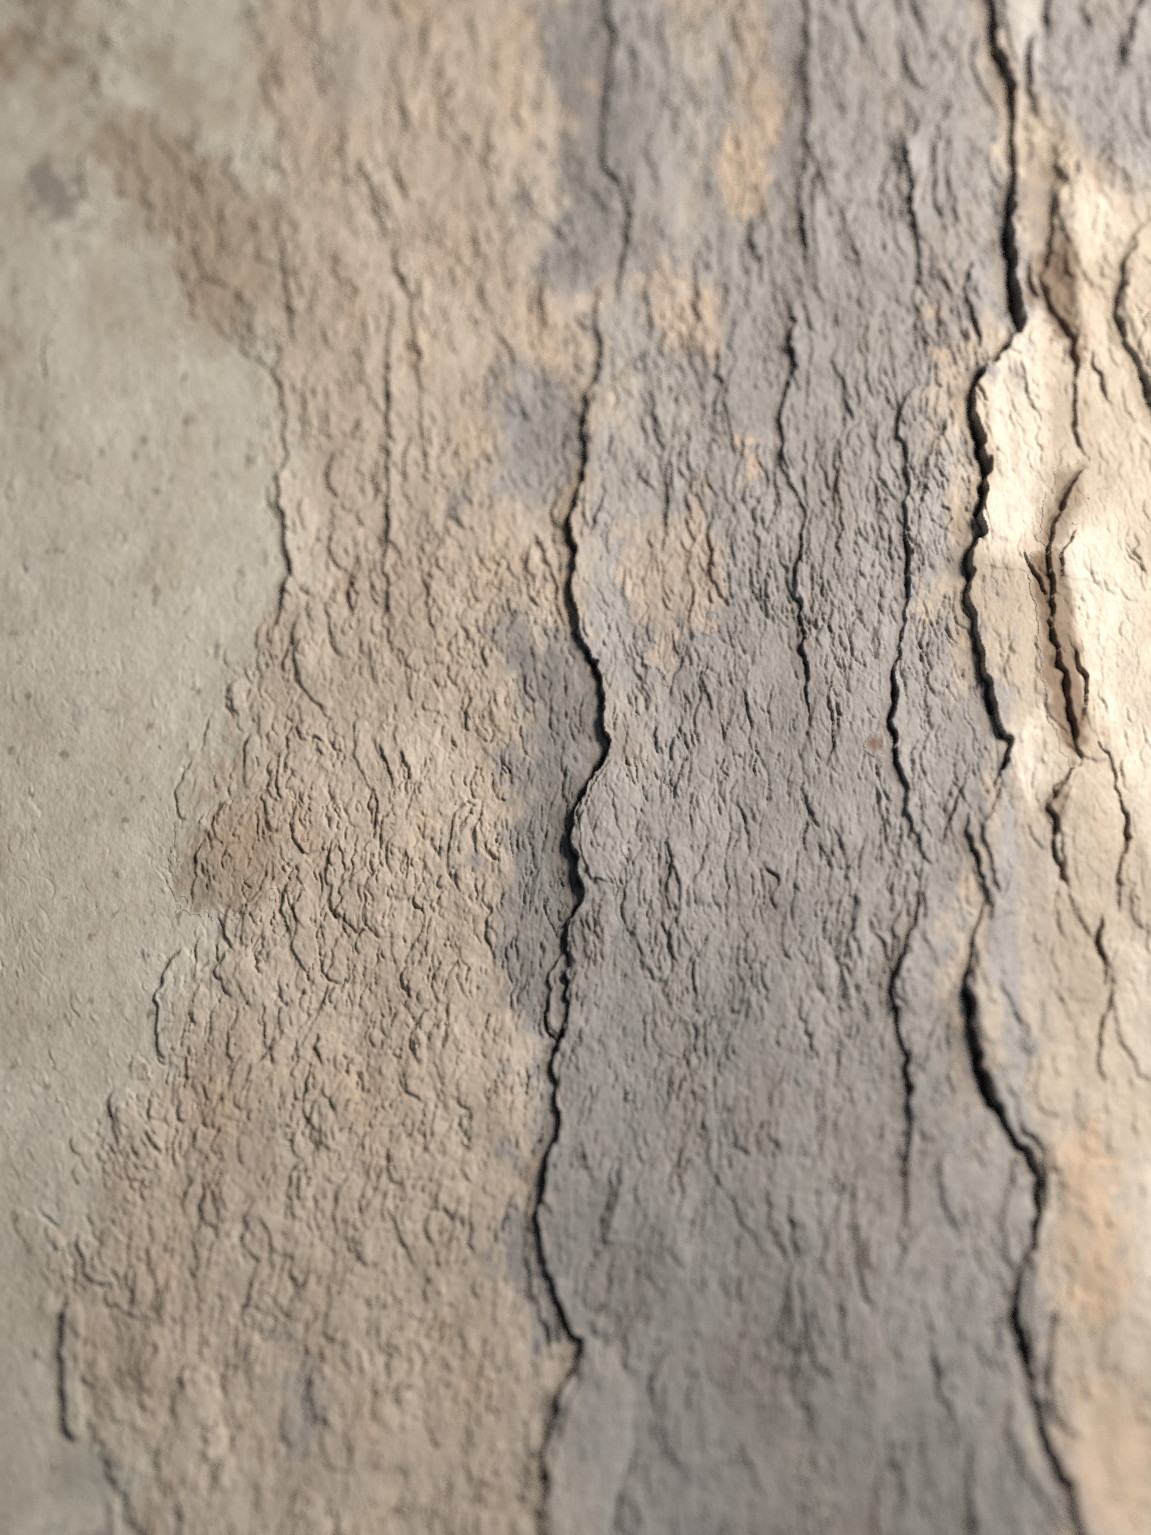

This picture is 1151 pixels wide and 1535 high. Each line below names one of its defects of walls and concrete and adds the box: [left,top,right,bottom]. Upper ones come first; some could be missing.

crack [969,0,1146,167]
crack [1055,142,1073,183]
crack [524,0,641,1535]
peeling [982,787,1015,892]
crack [886,218,1151,1455]
peeling [1061,771,1119,941]
peeling [61,1304,85,1440]
crack [793,1268,852,1387]
crack [932,1351,979,1535]
peeling [1003,1178,1073,1415]
peeling [1007,1395,1075,1535]
crack [1071,1503,1087,1535]